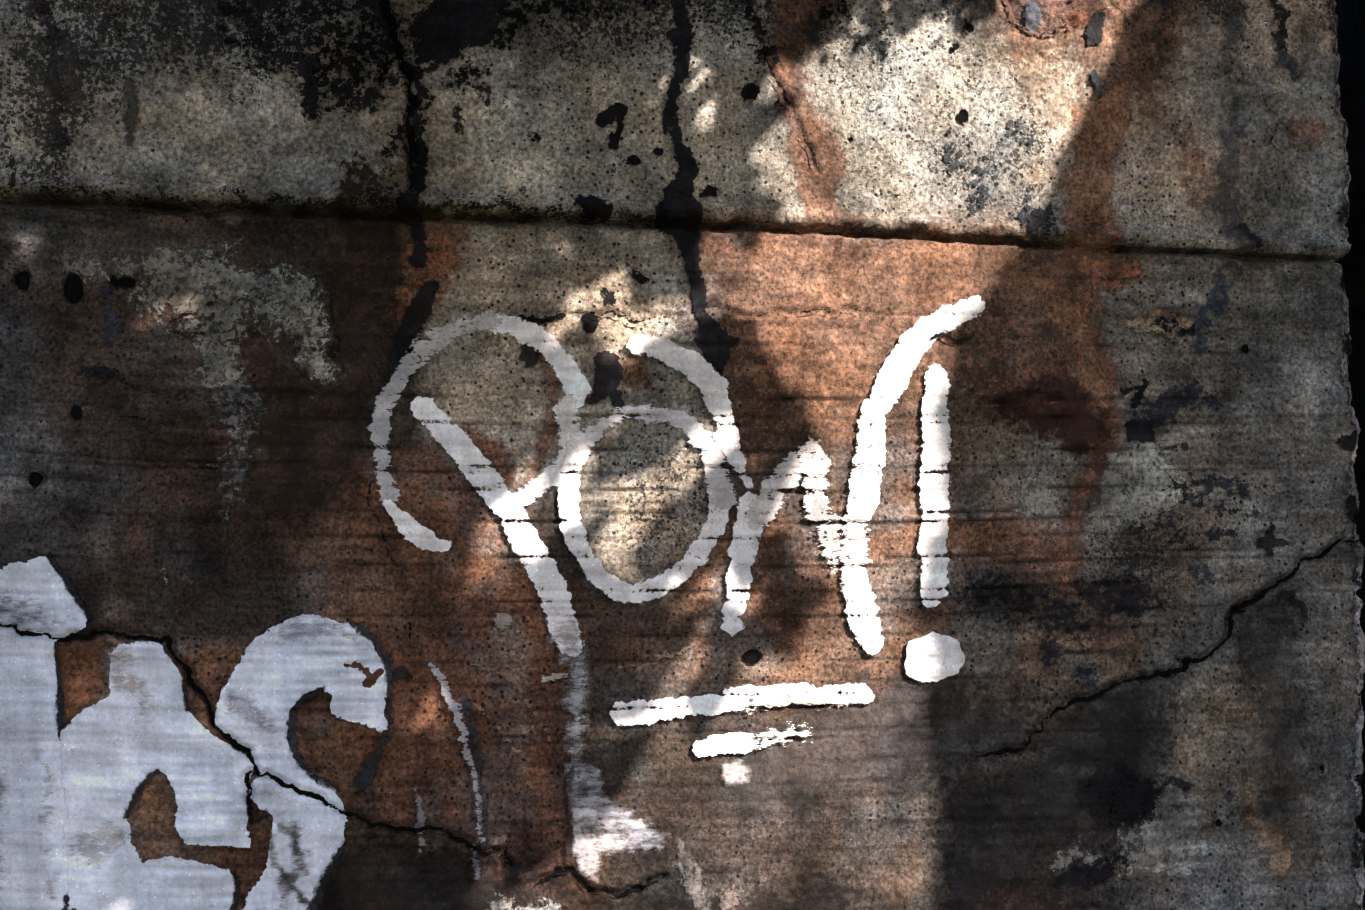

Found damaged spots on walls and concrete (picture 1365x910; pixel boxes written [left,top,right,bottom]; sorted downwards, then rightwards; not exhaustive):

damp [334,122,408,212]
crack [378,0,418,192]
damp [211,0,622,123]
damp [730,0,771,70]
damp [800,0,853,48]
corrosion [1172,124,1216,207]
corrosion [703,0,1197,657]
crack [366,482,414,639]
crack [975,539,1363,758]
crack [0,623,665,897]